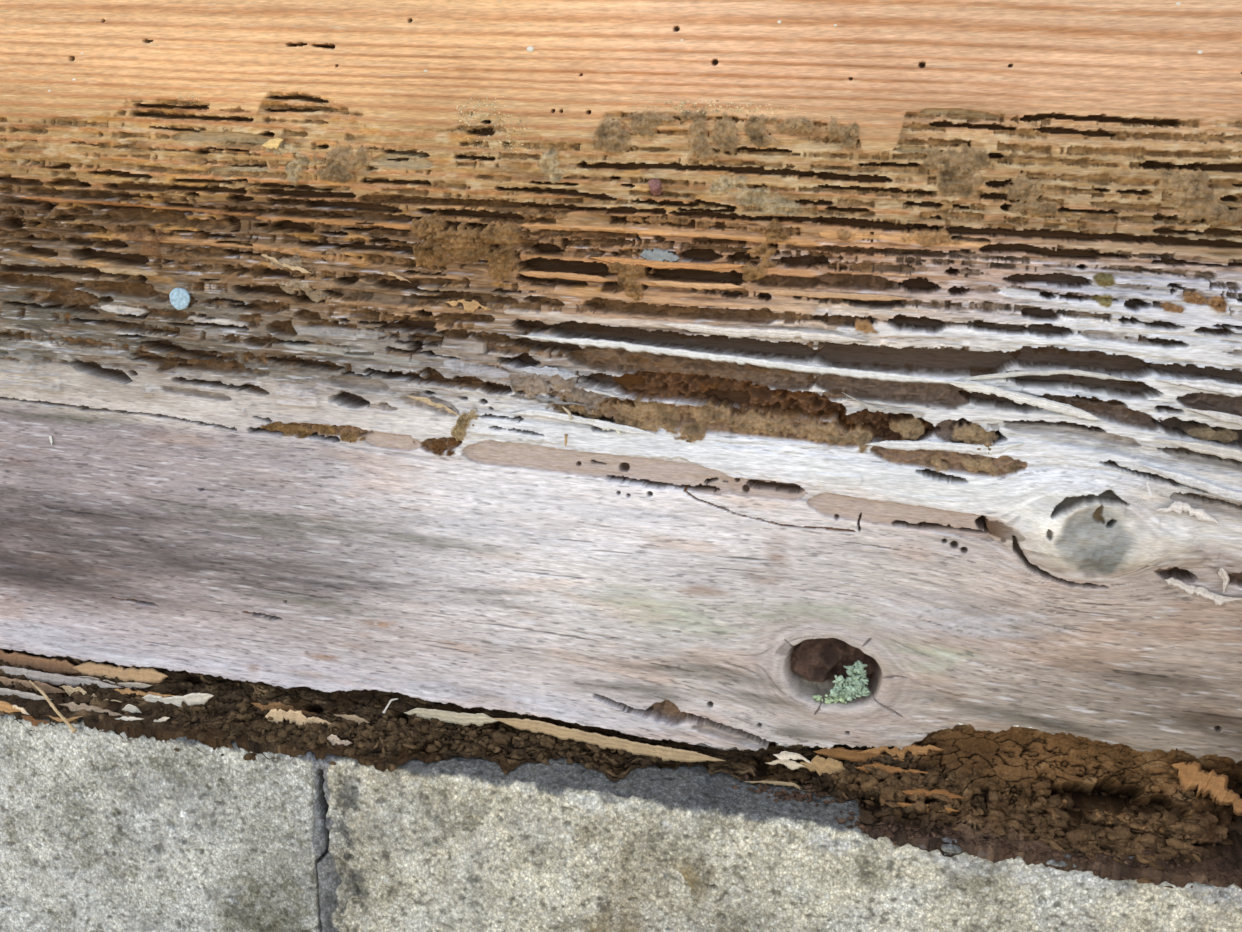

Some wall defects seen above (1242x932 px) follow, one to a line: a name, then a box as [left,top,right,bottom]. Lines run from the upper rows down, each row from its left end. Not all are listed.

crack [315,768,330,931]